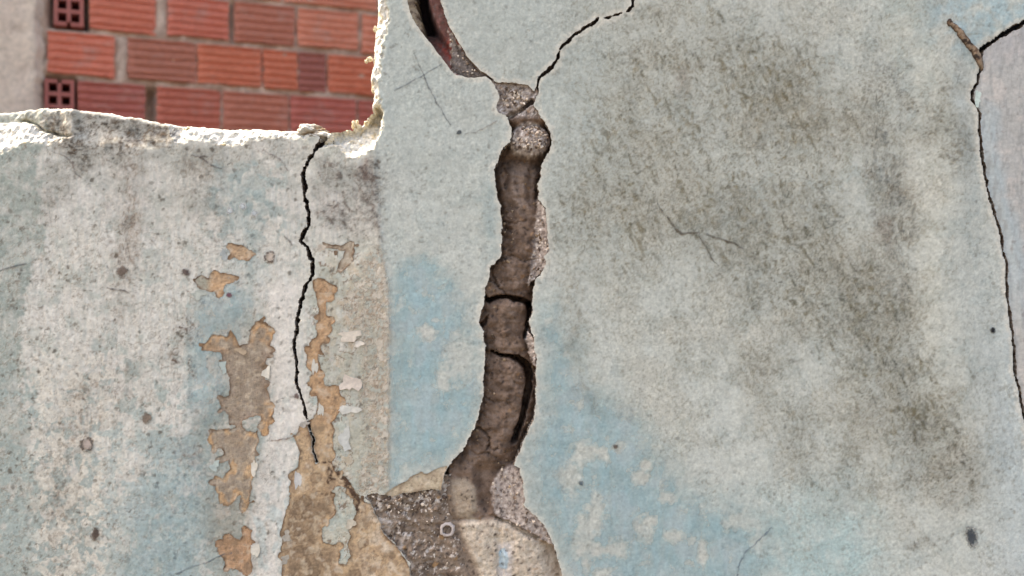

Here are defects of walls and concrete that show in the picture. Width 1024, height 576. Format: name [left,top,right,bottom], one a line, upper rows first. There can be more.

spalling [321,0,389,159]
crack [947,19,1024,108]
peeling [182,243,275,300]
peeling [199,316,275,513]
crack [277,141,360,512]
peeling [278,241,469,576]
crack [408,0,634,576]
peeling [215,526,260,576]